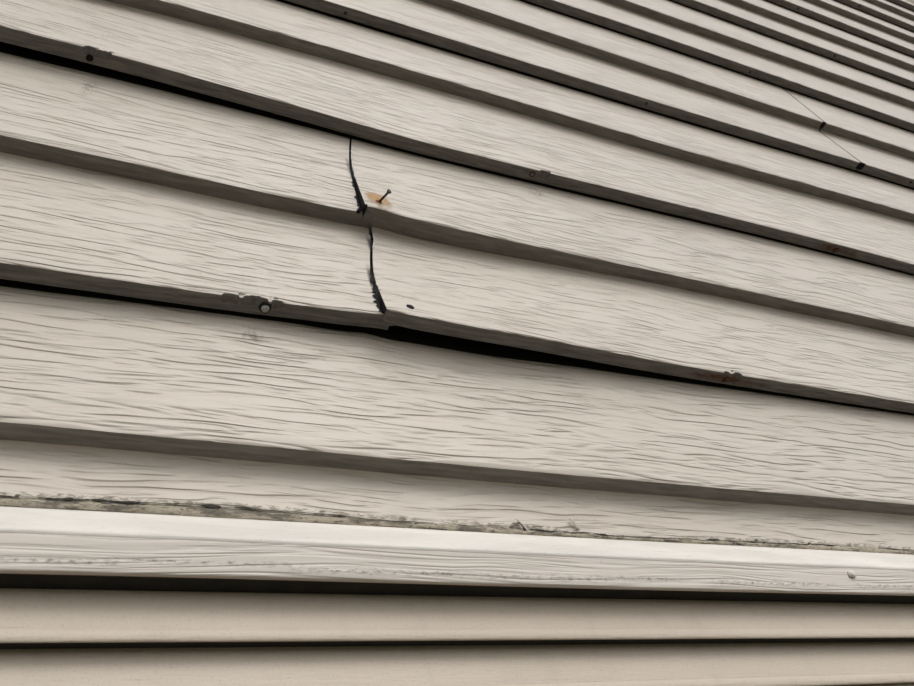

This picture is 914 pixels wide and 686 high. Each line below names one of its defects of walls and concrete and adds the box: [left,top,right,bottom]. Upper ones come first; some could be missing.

crack [349,141,386,317]
rust [368,193,390,204]